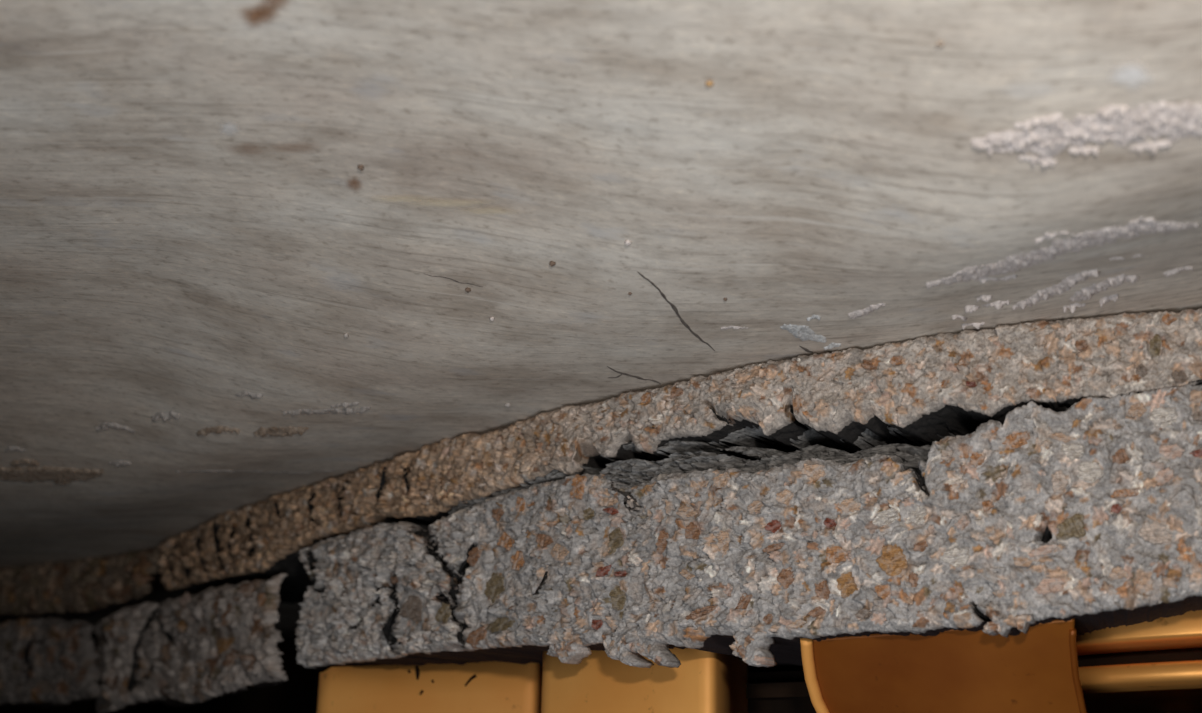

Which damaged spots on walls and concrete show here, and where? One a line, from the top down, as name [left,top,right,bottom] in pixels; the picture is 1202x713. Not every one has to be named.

rust [247,0,282,23]
crack [637,271,715,351]
crack [374,462,413,512]
crack [414,404,956,648]
crack [127,480,350,692]
crack [350,567,402,650]
crack [23,635,44,682]